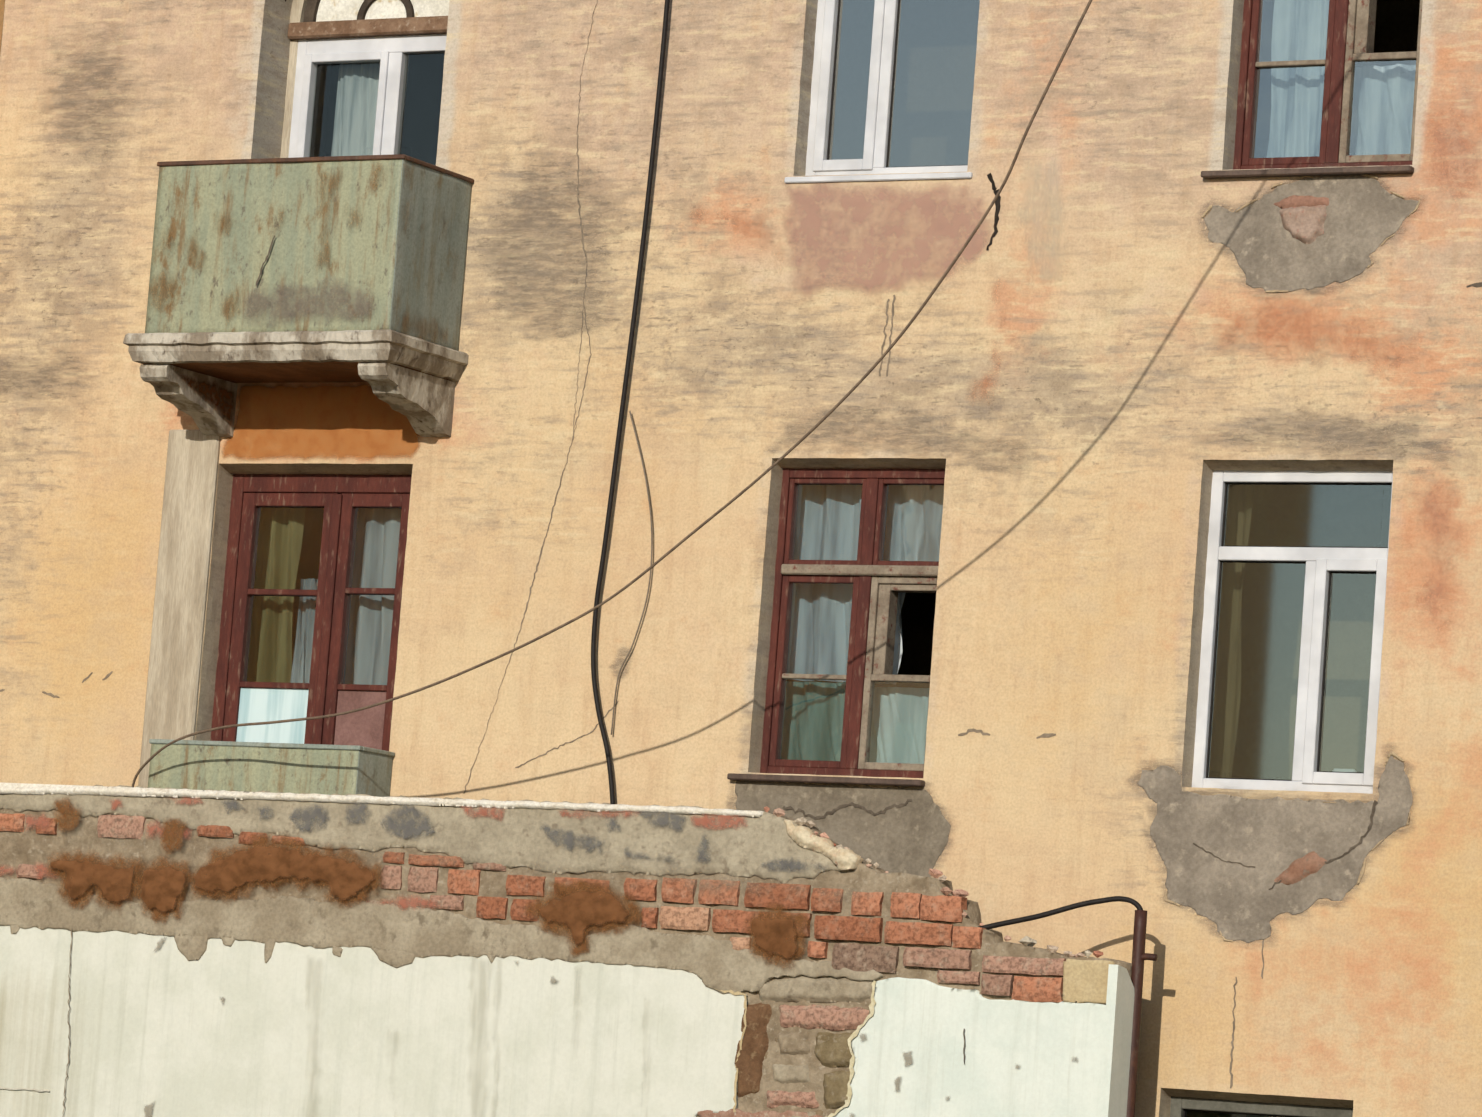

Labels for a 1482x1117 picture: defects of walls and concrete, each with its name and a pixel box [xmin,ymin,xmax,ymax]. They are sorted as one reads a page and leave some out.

crack [986,173,1001,250]
spalling [1201,174,1420,293]
spalling [735,780,951,877]
spalling [1137,751,1413,943]
peeling [0,877,883,1117]
peeling [895,1051,912,1091]
crack [1229,939,1264,1088]